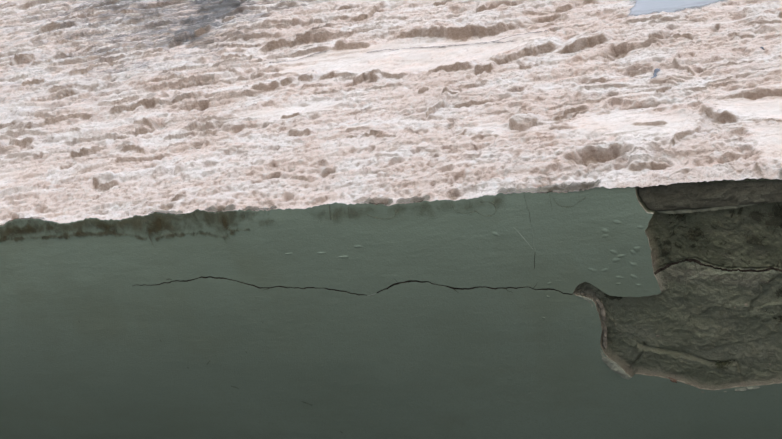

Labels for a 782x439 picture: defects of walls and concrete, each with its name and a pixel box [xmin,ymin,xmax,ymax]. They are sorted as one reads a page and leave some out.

crack [134,196,573,296]
spalling [574,178,782,393]
crack [654,259,782,275]